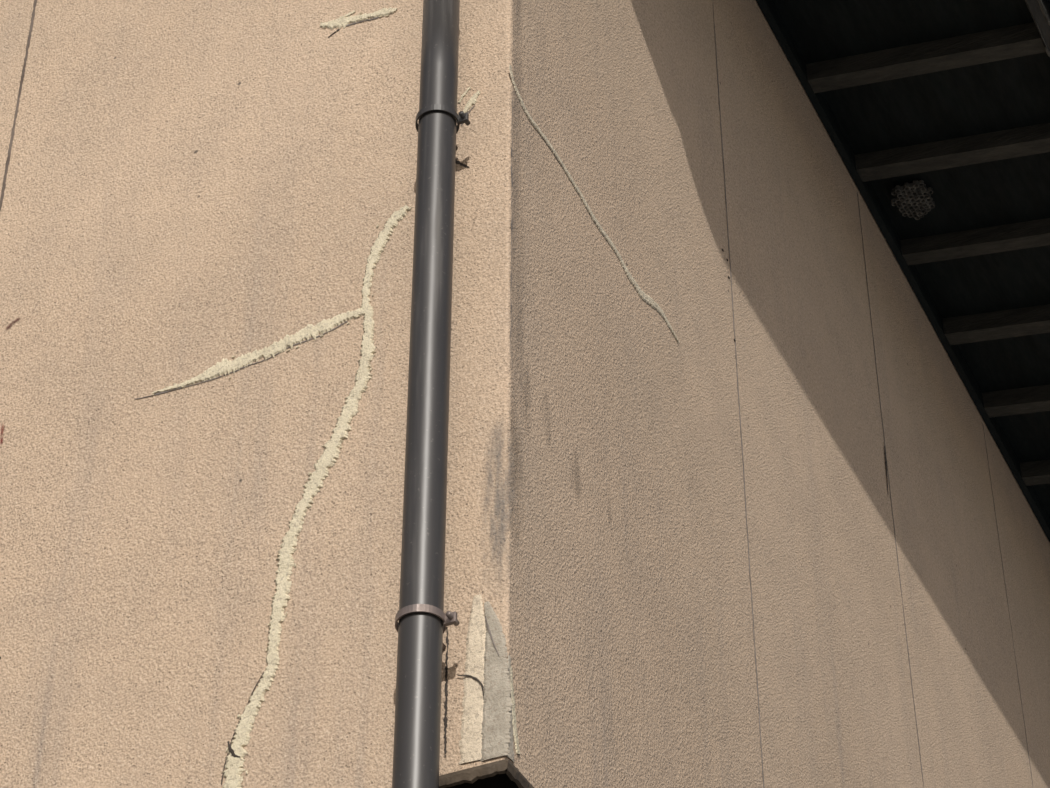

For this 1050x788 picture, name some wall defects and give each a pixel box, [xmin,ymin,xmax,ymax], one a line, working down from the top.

crack [320,7,397,38]
crack [458,87,481,126]
crack [507,148,515,341]
crack [509,65,679,343]
crack [135,205,412,788]